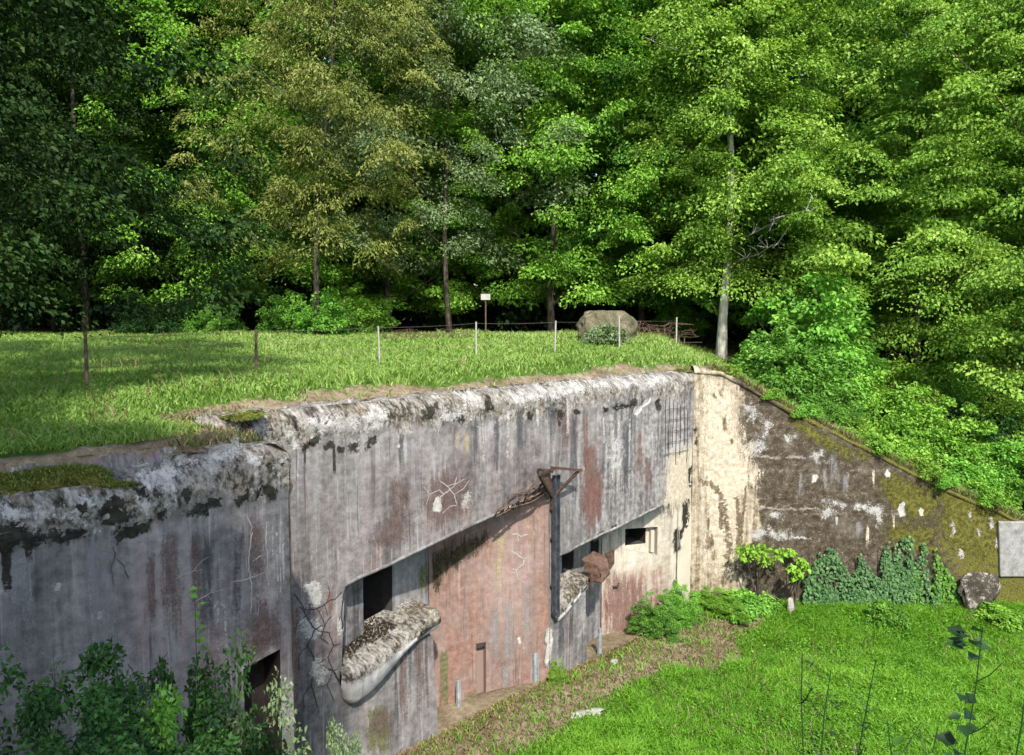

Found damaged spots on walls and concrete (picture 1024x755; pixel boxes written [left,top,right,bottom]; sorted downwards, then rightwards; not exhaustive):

leakage [333,446,347,496]
crack [424,477,469,513]
leakage [456,411,523,470]
leakage [536,396,578,492]
rust [580,418,603,534]
leakage [602,413,631,497]
leakage [1,542,33,610]
crack [294,585,345,707]